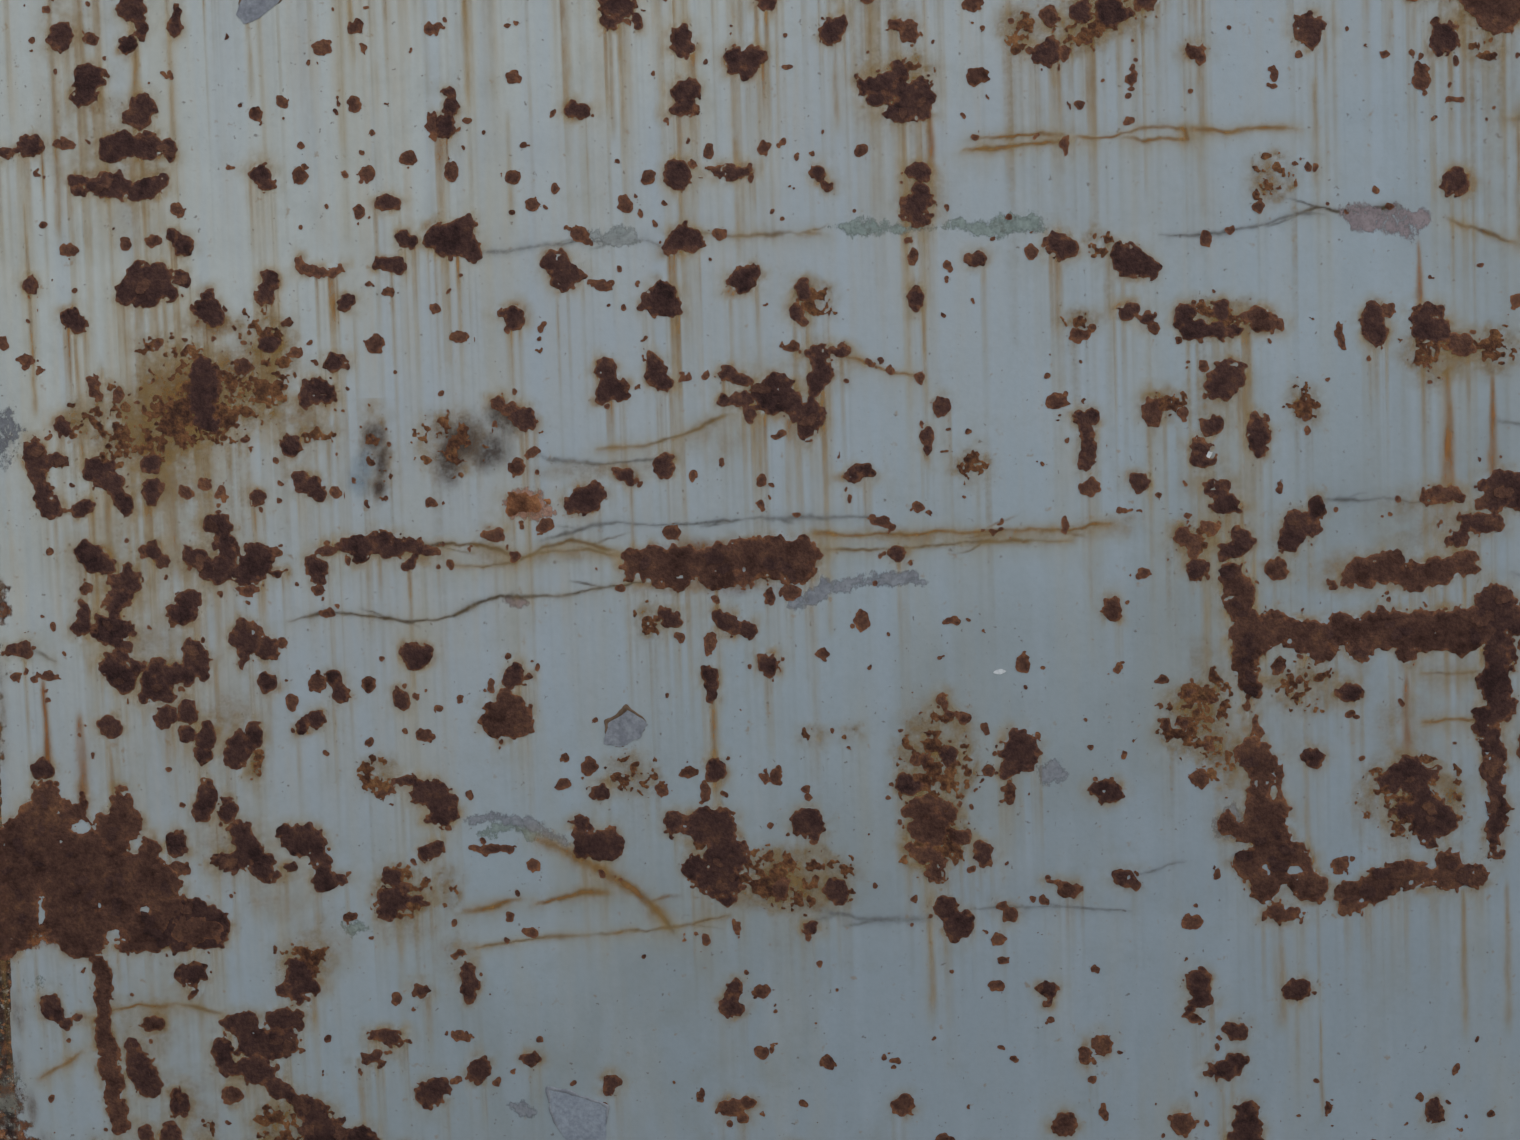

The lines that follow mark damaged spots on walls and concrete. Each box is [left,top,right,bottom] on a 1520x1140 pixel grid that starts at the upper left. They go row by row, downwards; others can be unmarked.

peeling [236,0,282,24]
rust [539,137,834,335]
rust [854,17,949,266]
rust [594,277,895,442]
rust [0,0,491,1140]
rust [1111,266,1520,930]
rust [477,653,540,750]
peeling [604,704,647,747]
rust [554,512,856,942]
rust [885,692,1083,992]
peeling [509,1086,609,1140]
rust [1155,957,1252,1140]